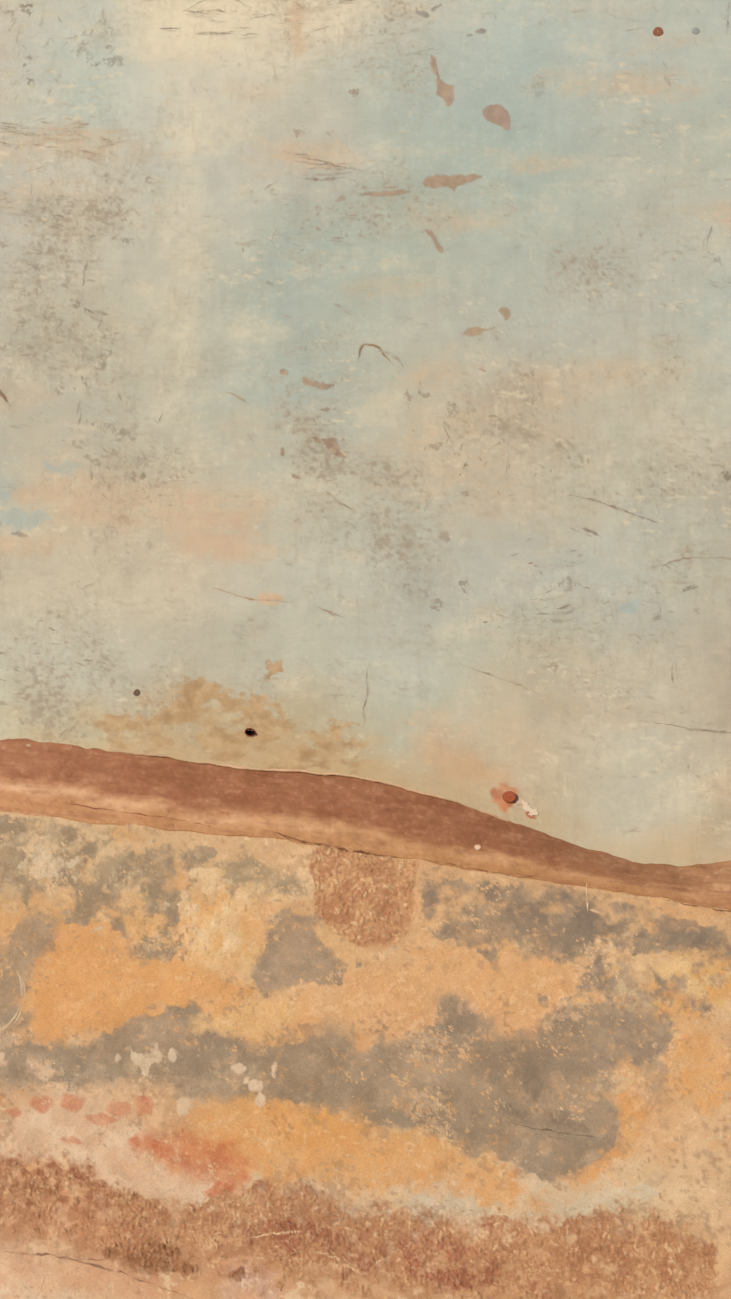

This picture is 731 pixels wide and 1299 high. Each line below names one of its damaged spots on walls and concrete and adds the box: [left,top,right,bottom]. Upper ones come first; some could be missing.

peeling [429,55,456,108]
peeling [481,103,512,132]
crack [647,556,731,569]
crack [639,720,731,734]
peeling [0,814,731,1183]
water stain [484,1057,591,1135]
spalling [0,1142,731,1299]